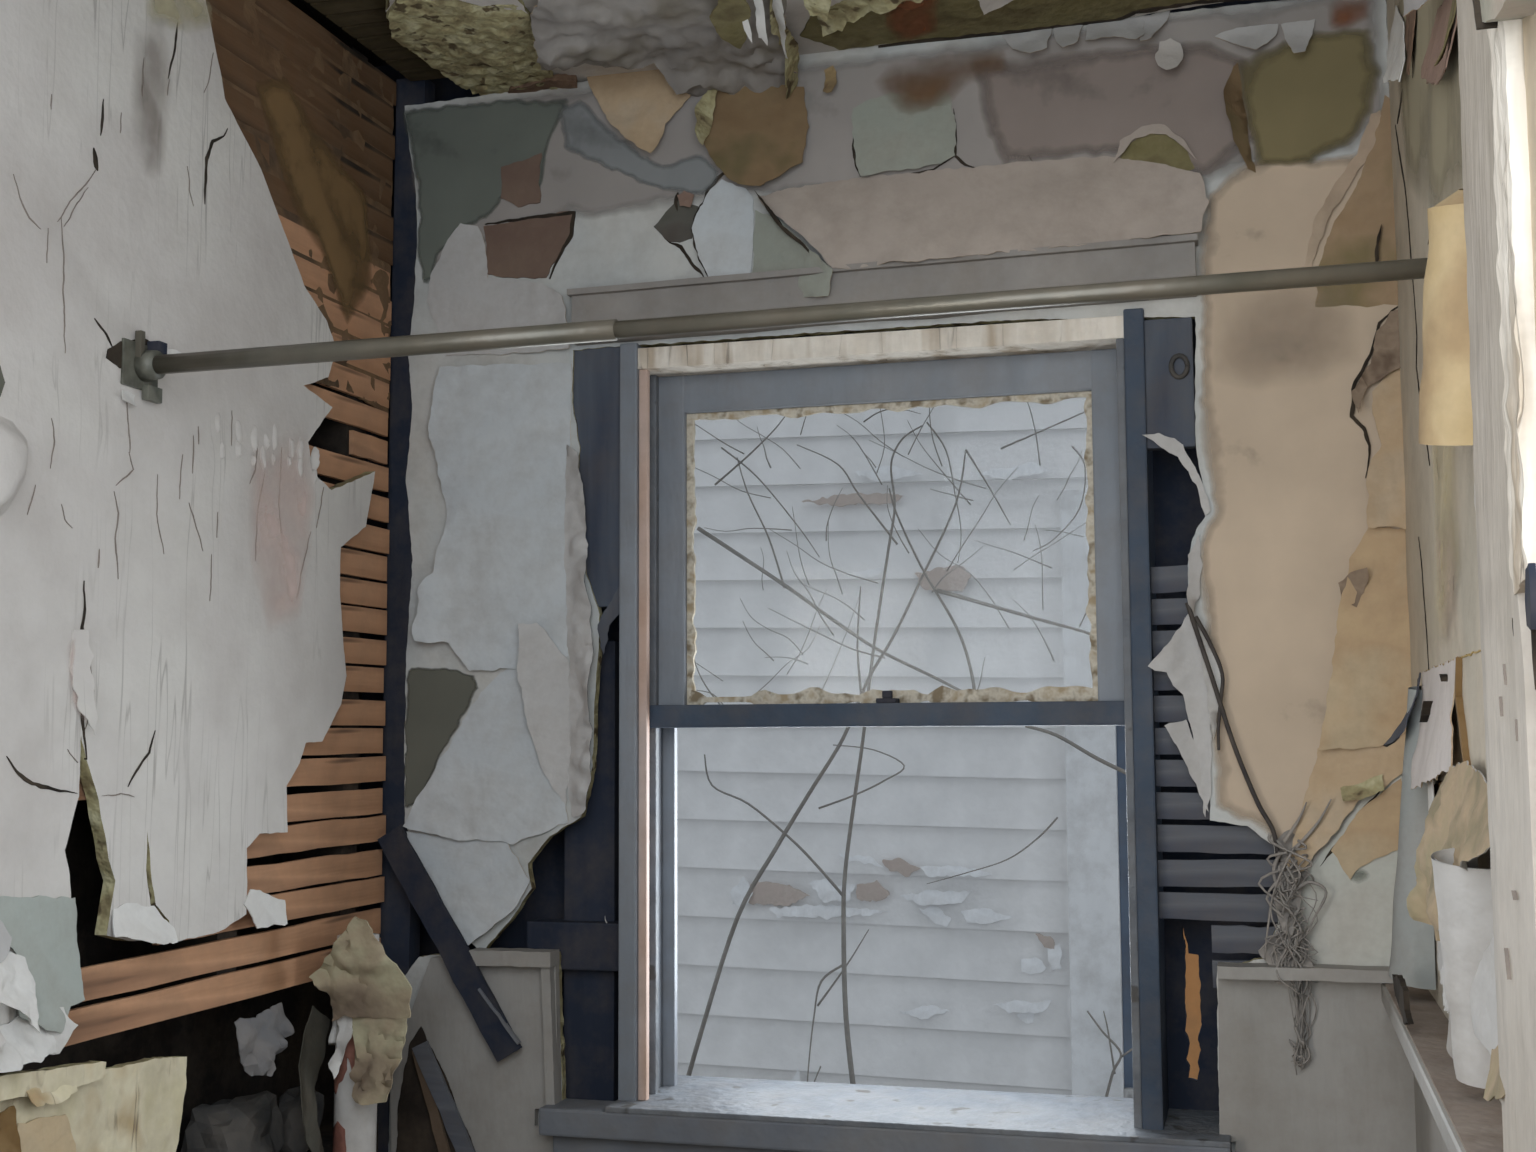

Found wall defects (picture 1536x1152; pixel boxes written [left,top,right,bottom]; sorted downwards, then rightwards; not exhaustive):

crack [13,22,214,353]
crack [187,128,228,206]
flaking render [206,0,1254,341]
flaking render [1215,5,1416,173]
peeling [801,465,922,507]
peeling [977,462,1055,480]
flaking render [1143,317,1210,515]
flaking render [64,344,620,1101]
flaking render [1148,535,1278,988]
peeling [730,852,1013,927]
peeling [1021,933,1062,975]
peeling [1331,761,1494,1089]